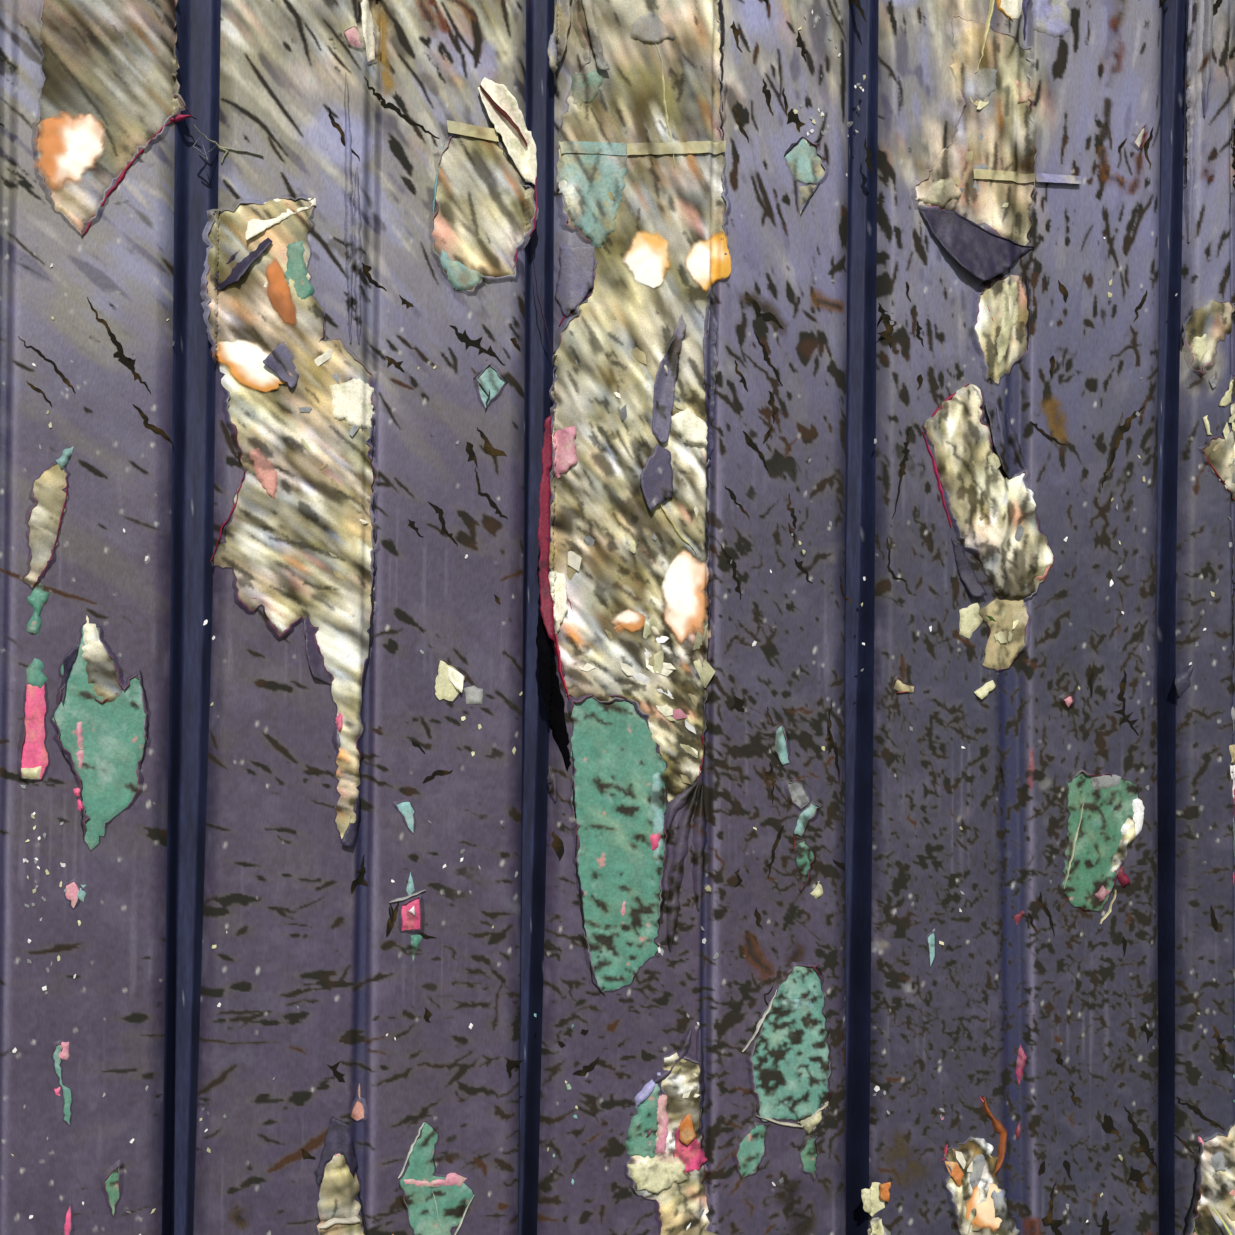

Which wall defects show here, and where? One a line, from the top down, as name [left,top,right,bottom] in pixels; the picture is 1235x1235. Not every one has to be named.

peeling [31,0,197,239]
peeling [200,193,380,848]
peeling [428,0,731,995]
peeling [911,0,1072,699]
peeling [1181,298,1235,521]
peeling [17,616,151,852]
peeling [1060,766,1149,924]
peeling [398,1120,475,1235]
peeling [623,1050,717,1235]
peeling [731,962,833,1183]
peeling [941,1096,1021,1235]
peeling [1180,1122,1235,1235]